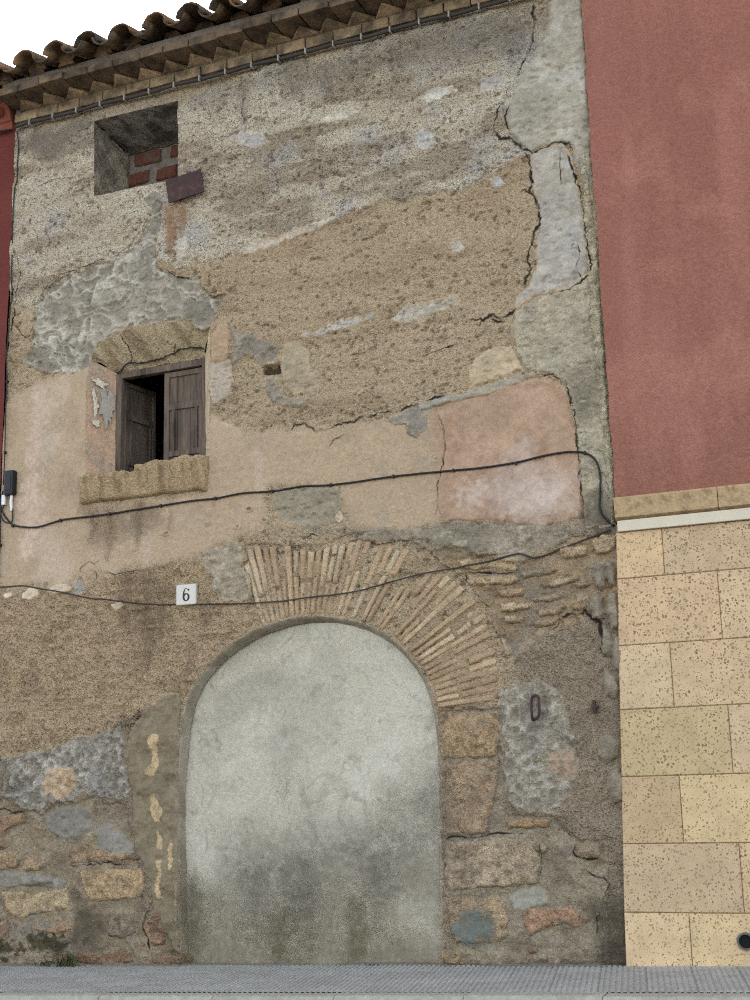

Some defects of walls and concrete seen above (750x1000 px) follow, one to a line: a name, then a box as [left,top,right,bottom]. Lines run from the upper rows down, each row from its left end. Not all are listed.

flaking render [489,176,506,190]
crack [493,106,593,292]
flaking render [240,216,335,256]
flaking render [450,238,465,253]
flaking render [23,206,230,374]
flaking render [298,294,460,339]
crack [471,308,516,324]
spalling [262,364,281,376]
flaking render [92,378,115,430]
crack [291,395,445,507]
flaking render [0,726,194,965]